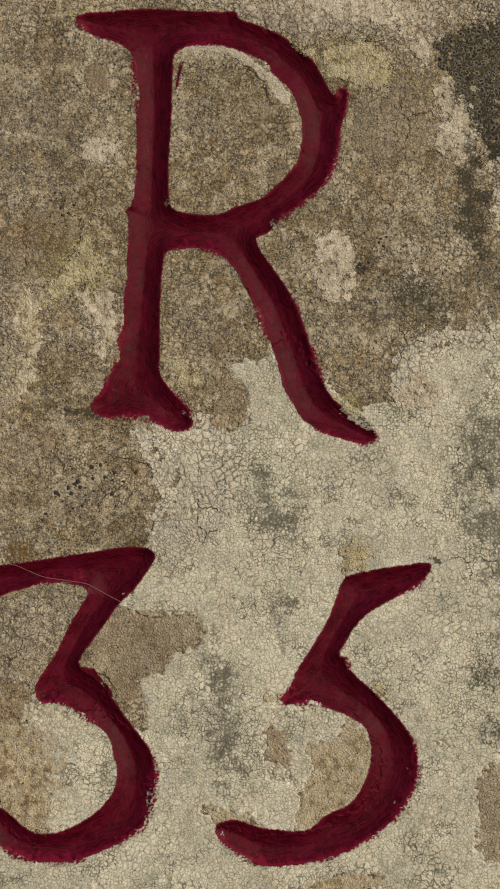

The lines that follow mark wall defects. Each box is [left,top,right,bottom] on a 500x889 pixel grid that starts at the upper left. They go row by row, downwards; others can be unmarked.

water stain [428,0,500,260]
crack [396,323,425,373]
crack [98,452,157,509]
crack [452,447,493,478]
crack [197,499,222,544]
crack [451,556,500,584]